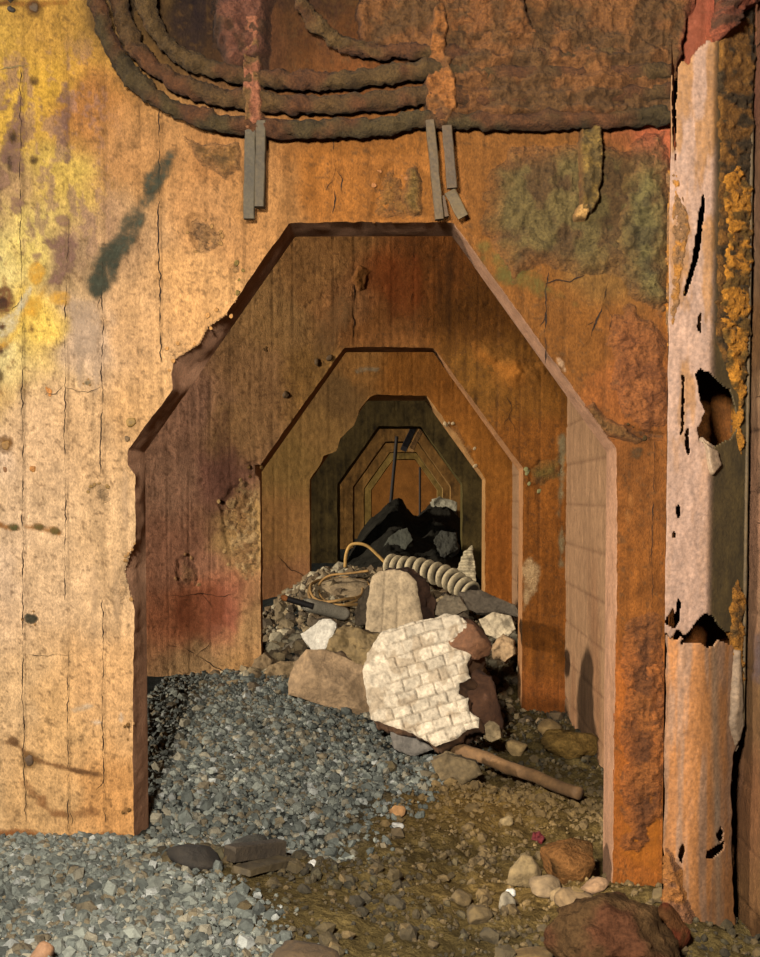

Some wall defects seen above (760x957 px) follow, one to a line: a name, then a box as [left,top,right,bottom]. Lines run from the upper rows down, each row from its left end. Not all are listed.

damp [88,152,173,298]
spalling [185,218,224,253]
spalling [371,170,419,223]
corrosion [355,0,760,455]
spalling [217,460,264,581]
corrosion [725,579,747,685]